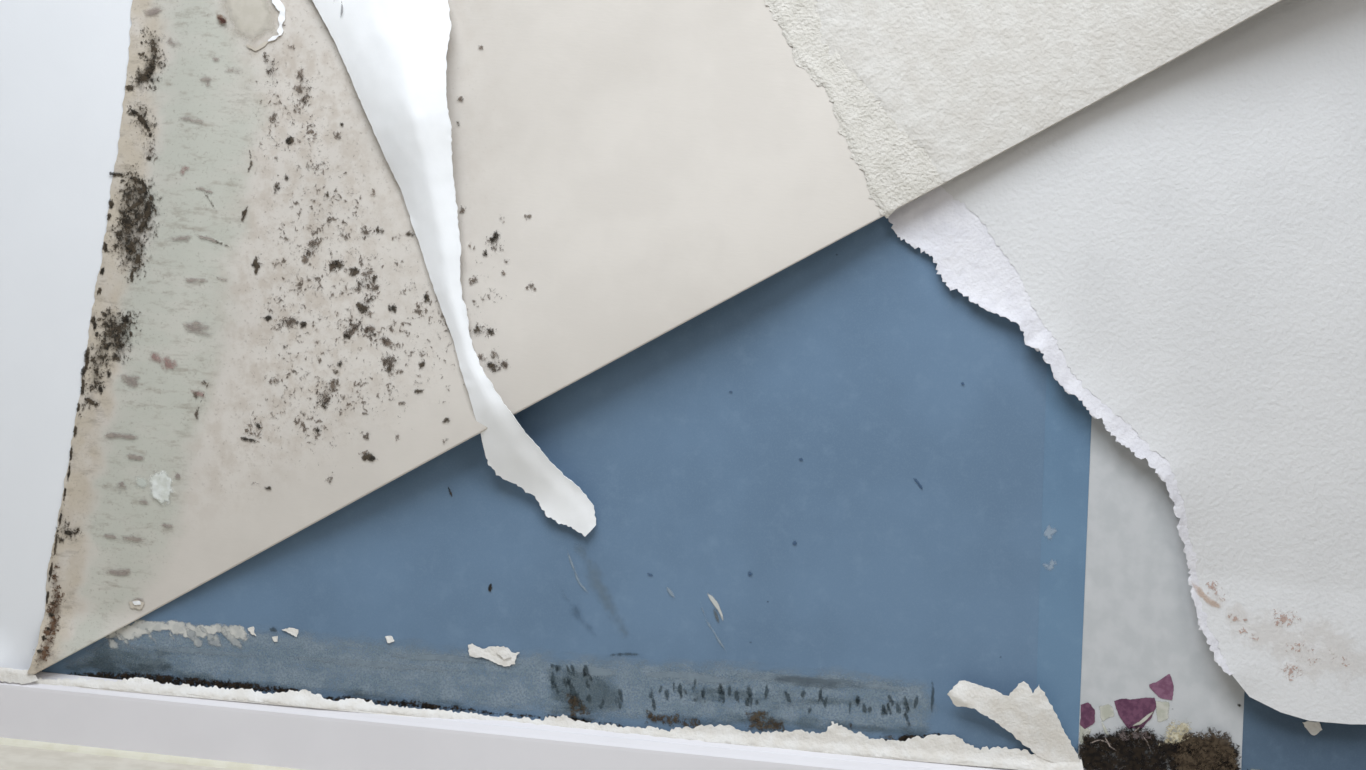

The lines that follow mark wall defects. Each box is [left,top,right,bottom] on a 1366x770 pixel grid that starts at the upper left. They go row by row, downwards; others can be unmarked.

leakage [33,9,175,662]
peeling [0,0,488,684]
leakage [240,52,455,482]
leakage [467,221,508,310]
leakage [470,324,509,373]
peeling [446,0,1282,415]
leakage [67,626,940,741]
leakage [1077,721,1256,770]